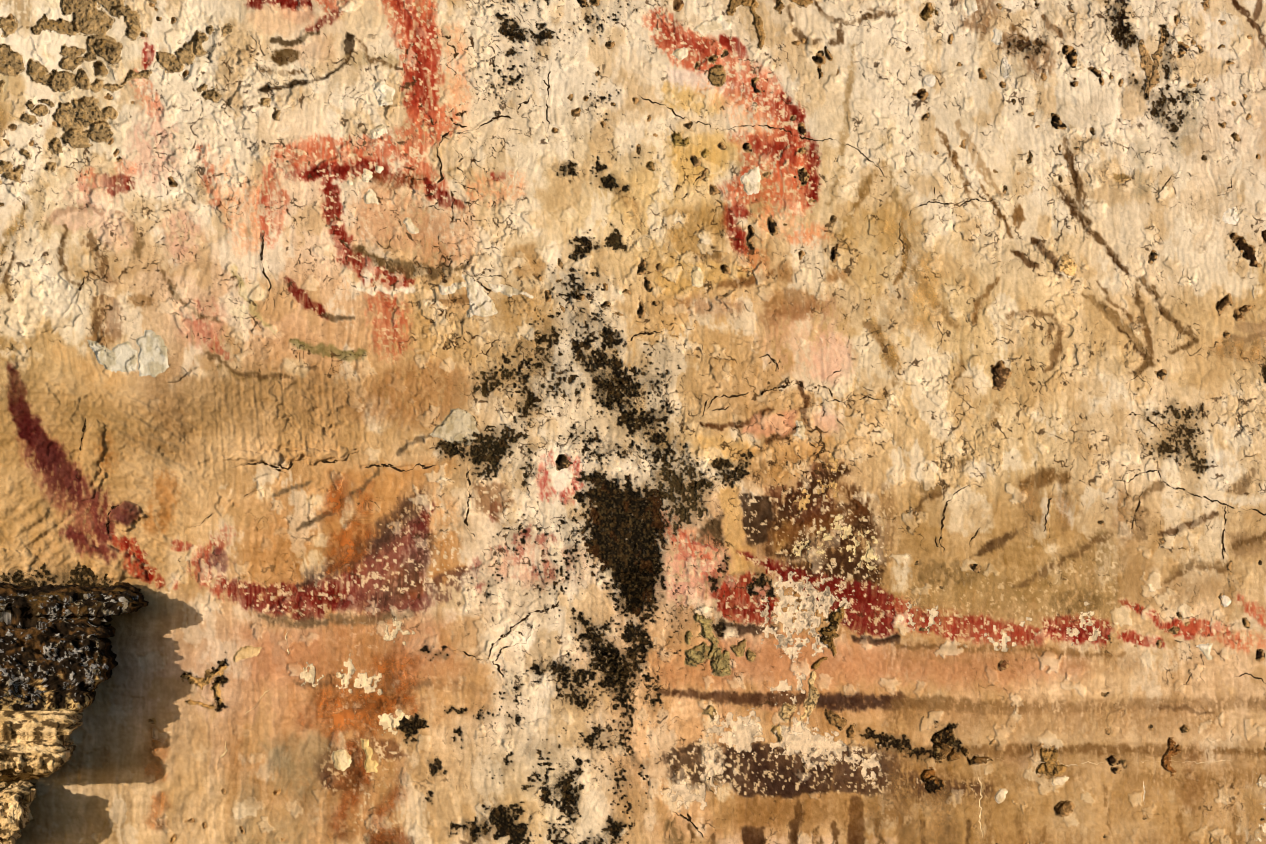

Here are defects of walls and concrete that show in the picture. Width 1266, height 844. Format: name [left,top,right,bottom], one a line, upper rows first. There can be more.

water stain [1104,0,1138,49]
spalling [0,0,233,185]
spalling [258,97,281,121]
water stain [1129,24,1201,148]
flaking render [87,330,169,378]
crack [0,0,733,793]
water stain [1146,398,1214,479]
water stain [435,223,753,844]
flaking render [660,514,882,812]
flaking render [984,617,1041,671]
water stain [423,758,446,804]
crack [669,812,713,837]